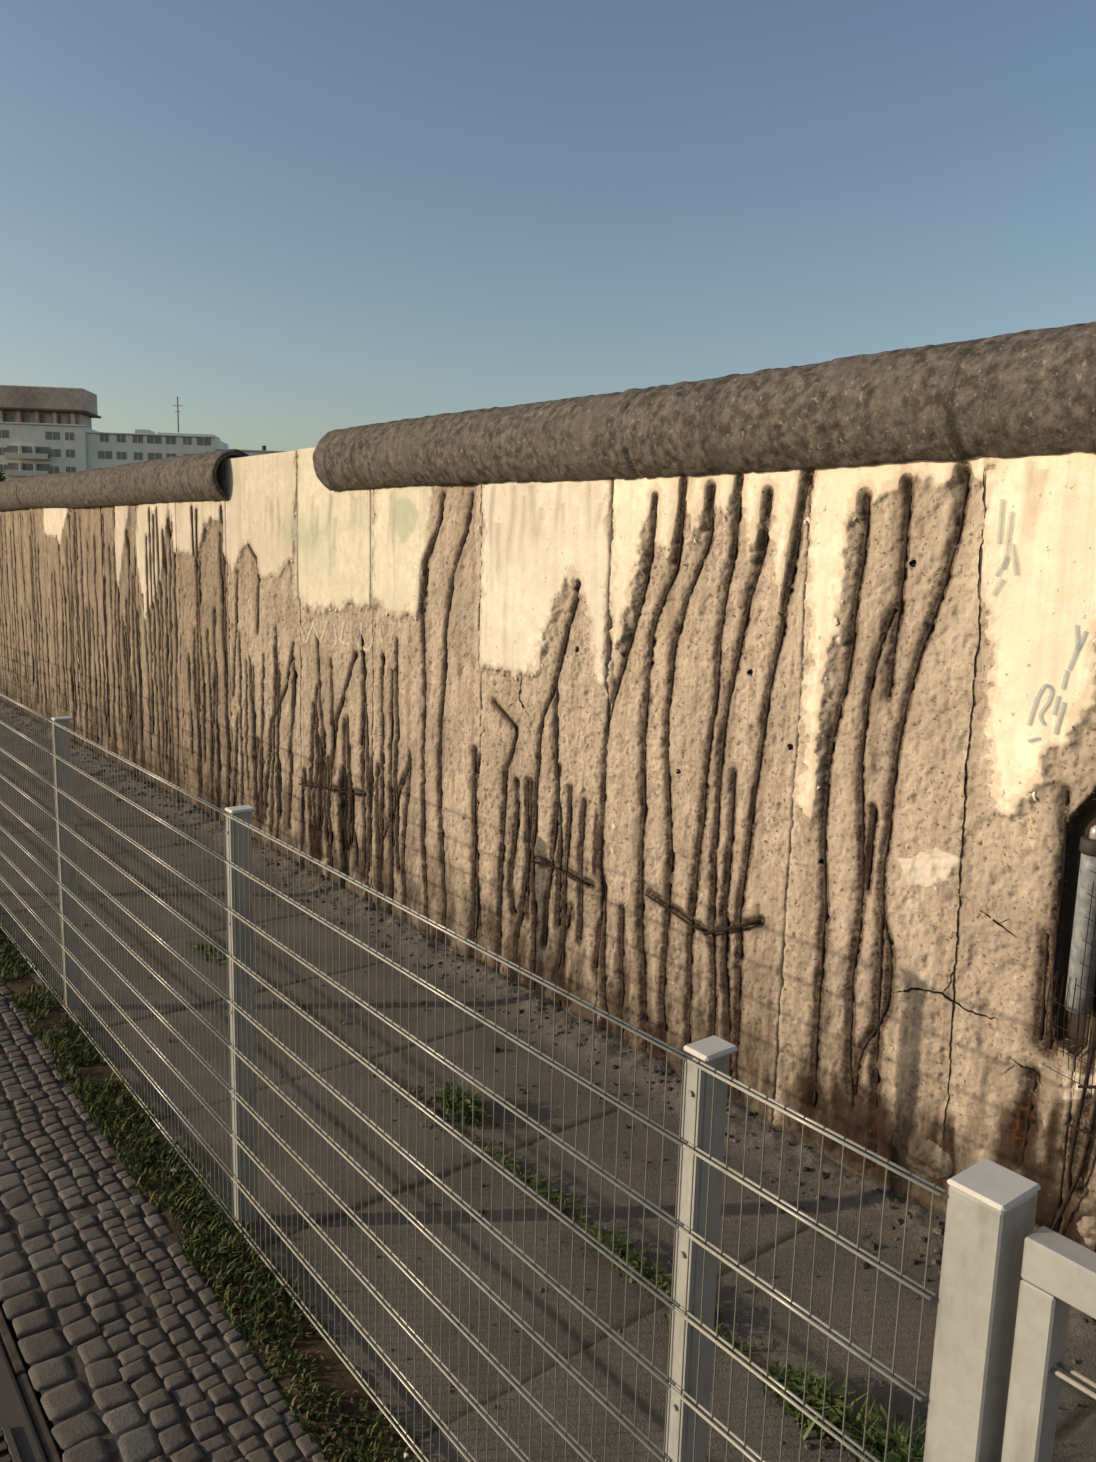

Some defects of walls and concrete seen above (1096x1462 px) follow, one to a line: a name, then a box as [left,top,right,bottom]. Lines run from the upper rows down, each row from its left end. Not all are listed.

spalling [0,452,1096,1234]
corrosion [556,965,571,1007]
crack [894,468,1017,1140]
corrosion [994,1102,1091,1245]